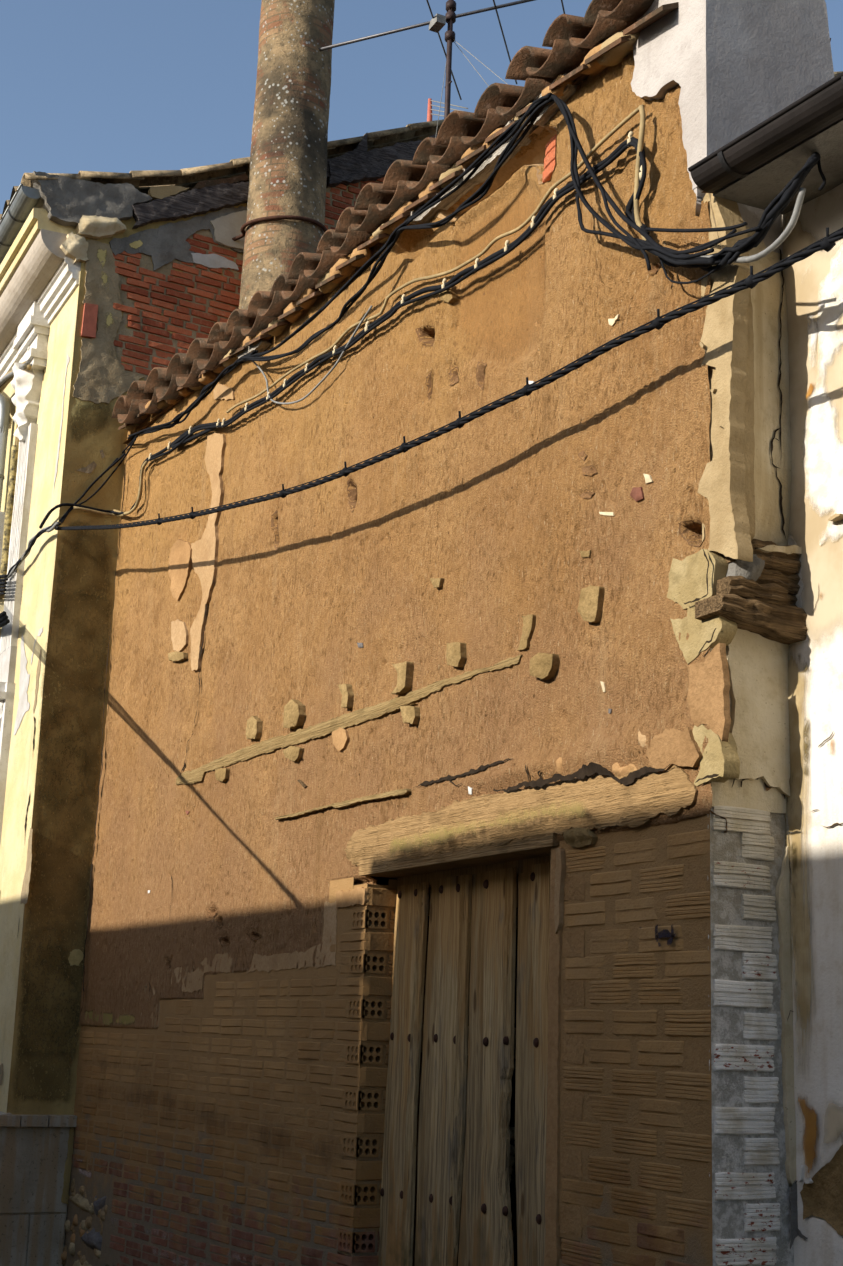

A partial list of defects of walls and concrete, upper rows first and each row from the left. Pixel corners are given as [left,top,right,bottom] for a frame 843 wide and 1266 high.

flaking render [168,433,226,671]
flaking render [667,264,790,797]
crack [771,249,786,538]
peeling [804,245,843,545]
damp [16,510,135,1101]
crack [413,758,670,792]
crack [695,774,843,828]
spalling [789,1144,843,1249]